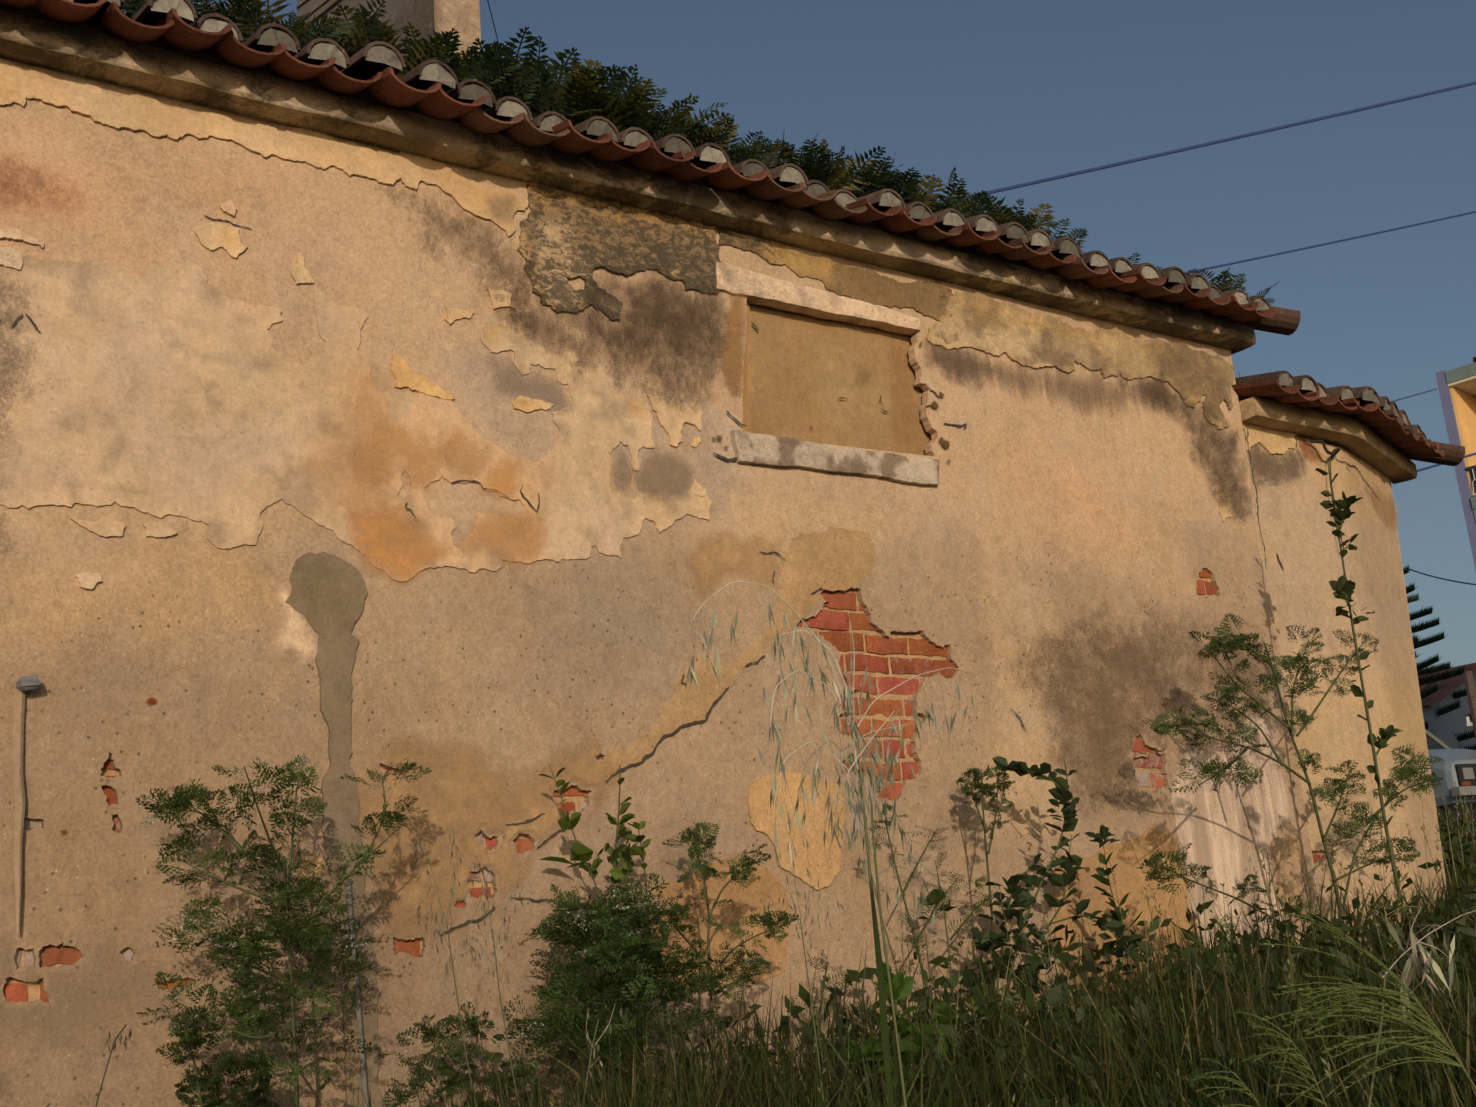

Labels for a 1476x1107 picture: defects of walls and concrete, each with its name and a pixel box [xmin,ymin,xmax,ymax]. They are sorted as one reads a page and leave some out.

peeling [0,57,1296,455]
peeling [0,228,728,582]
flaking render [1196,569,1217,598]
crack [605,655,766,783]
flaking render [796,589,956,801]
leakage [1019,614,1261,809]
flaking render [101,755,121,834]
flaking render [553,786,589,815]
flaking render [1132,736,1164,793]
flaking render [475,833,532,854]
flaking render [455,868,494,909]
flaking render [3,944,82,1002]